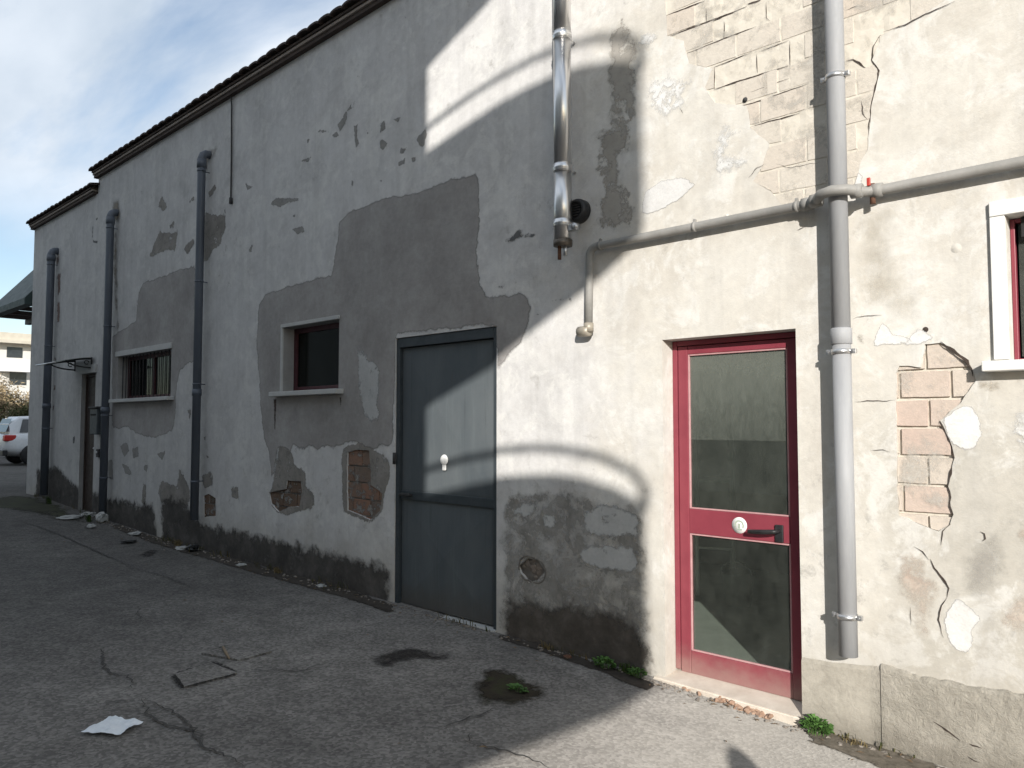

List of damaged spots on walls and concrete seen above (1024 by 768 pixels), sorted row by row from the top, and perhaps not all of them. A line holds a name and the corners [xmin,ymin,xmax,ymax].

flaking render [666,0,828,205]
flaking render [843,0,945,185]
crack [847,1,955,127]
water stain [36,466,78,510]
flaking render [108,210,226,507]
water stain [92,492,389,601]
flaking render [257,174,539,522]
flaking render [504,493,645,634]
water stain [505,602,648,674]
crack [915,422,955,638]
flaking render [896,327,976,531]
crack [941,342,973,376]